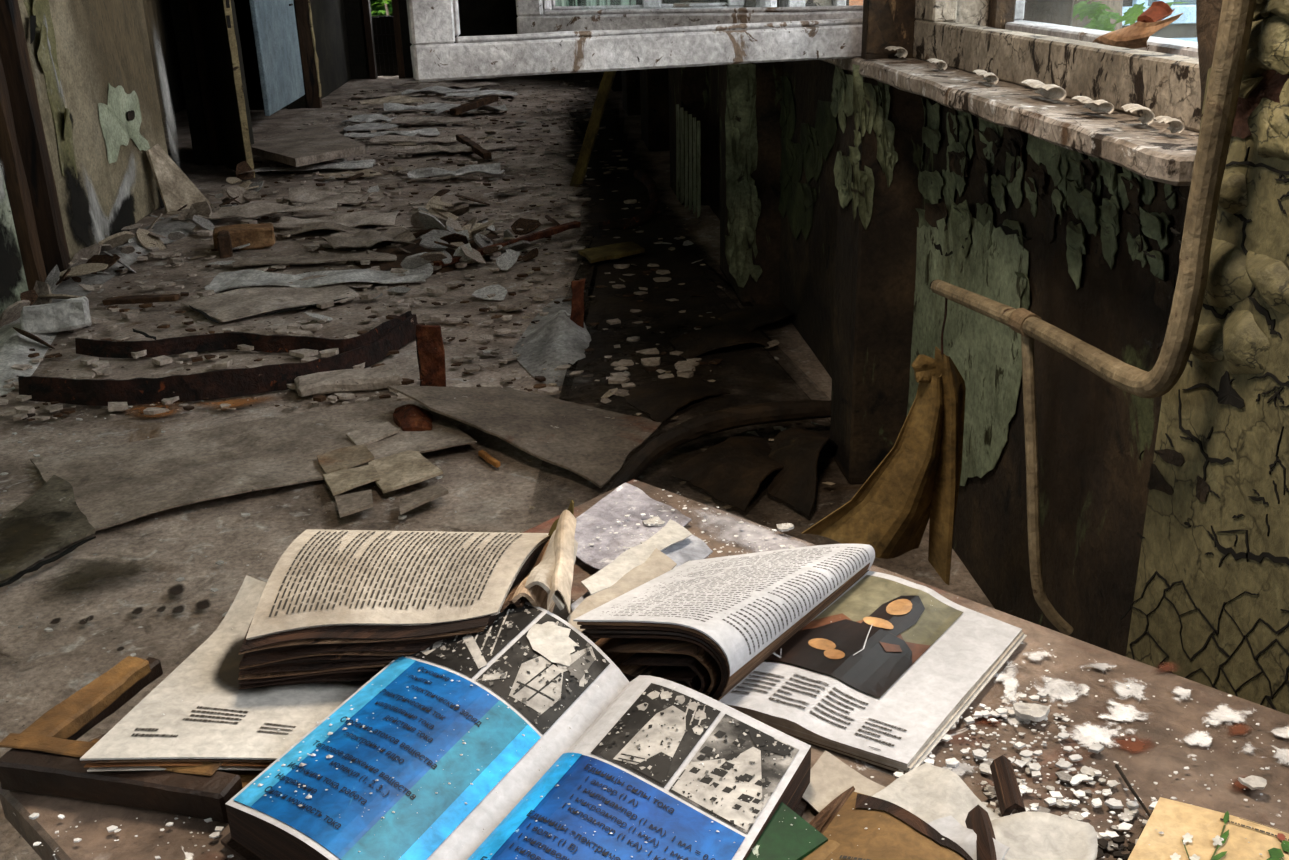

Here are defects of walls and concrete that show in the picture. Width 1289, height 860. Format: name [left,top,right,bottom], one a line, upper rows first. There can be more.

peeling [23,0,78,178]
peeling [98,84,150,164]
peeling [725,63,762,288]
peeling [830,64,898,230]
crack [1225,147,1289,255]
peeling [907,98,1176,486]
crack [1202,287,1282,343]
crack [1120,335,1289,711]